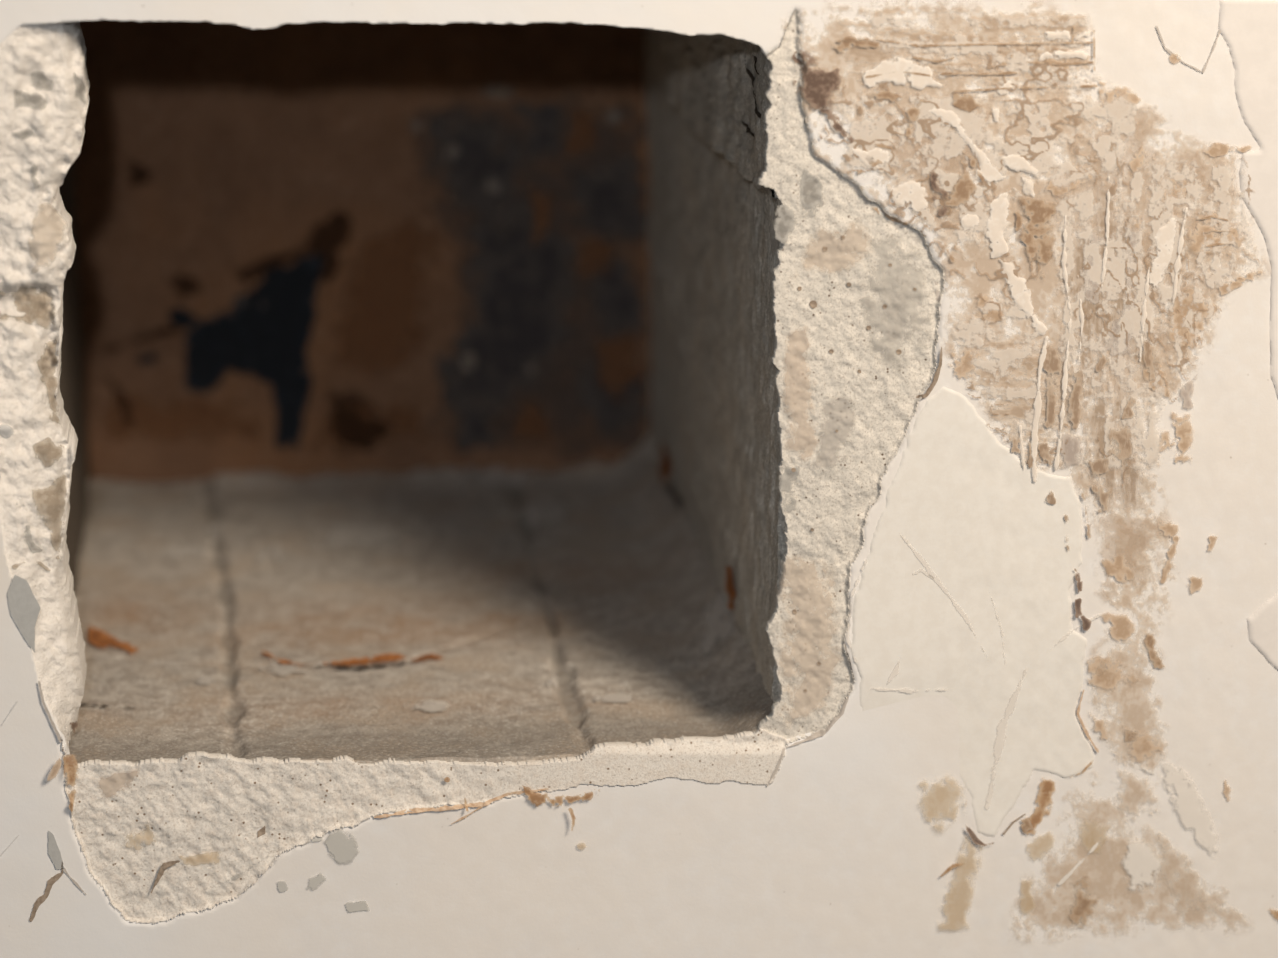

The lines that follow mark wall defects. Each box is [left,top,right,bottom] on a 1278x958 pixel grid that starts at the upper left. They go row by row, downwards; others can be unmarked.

spalling [0,21,90,766]
peeling [48,831,64,869]
corrosion [523,786,599,831]
spalling [65,9,1098,924]
damp [785,6,1263,938]
peeling [1053,0,1278,470]